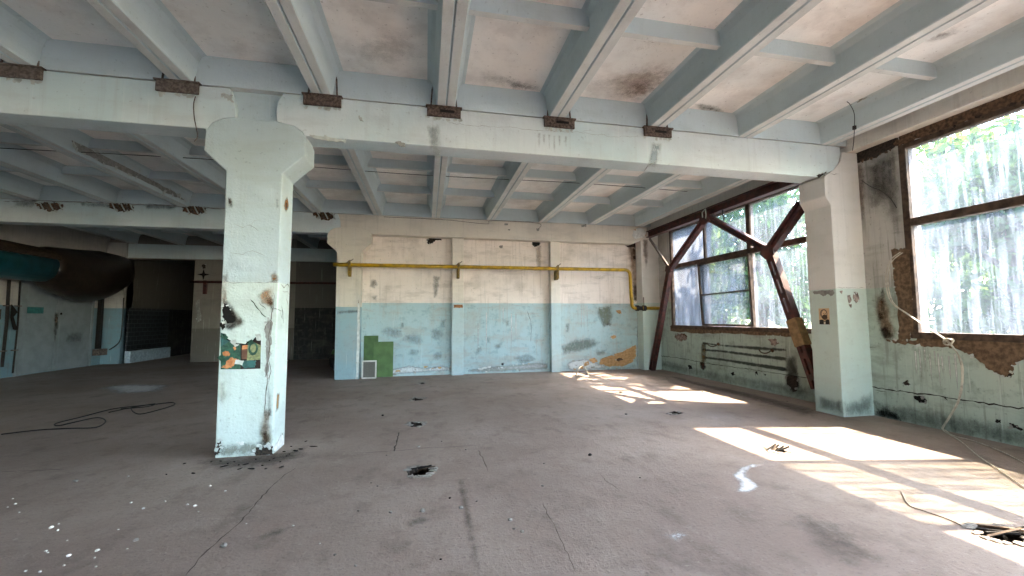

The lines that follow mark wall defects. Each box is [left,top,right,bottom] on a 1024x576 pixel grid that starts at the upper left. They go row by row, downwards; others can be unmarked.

spalling [220,303,235,330]
flaking render [886,247,1024,378]
flaking render [669,325,791,347]
flaking render [569,345,637,370]
leakage [821,399,870,411]